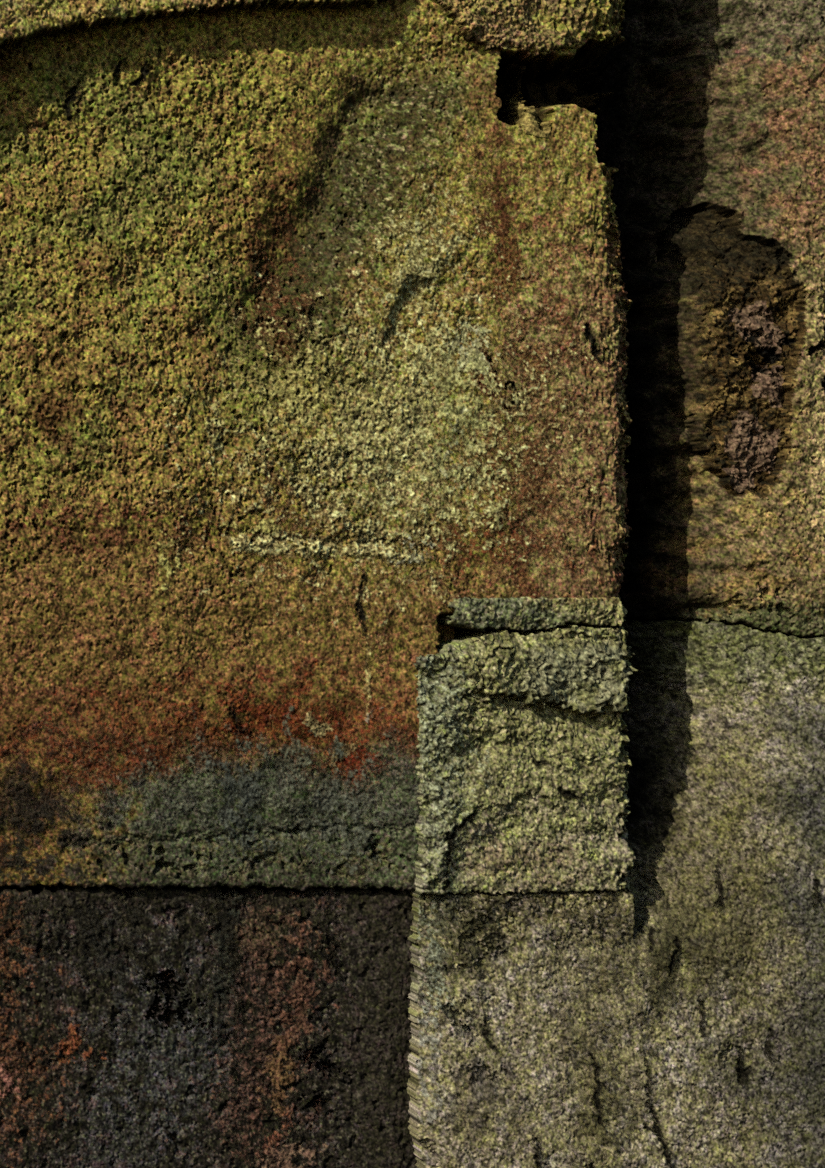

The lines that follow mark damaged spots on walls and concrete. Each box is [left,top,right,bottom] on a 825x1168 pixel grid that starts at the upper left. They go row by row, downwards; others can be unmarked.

spalling [496,46,613,137]
rust [0,653,420,797]
rust [0,894,106,1168]
rust [205,902,336,1168]